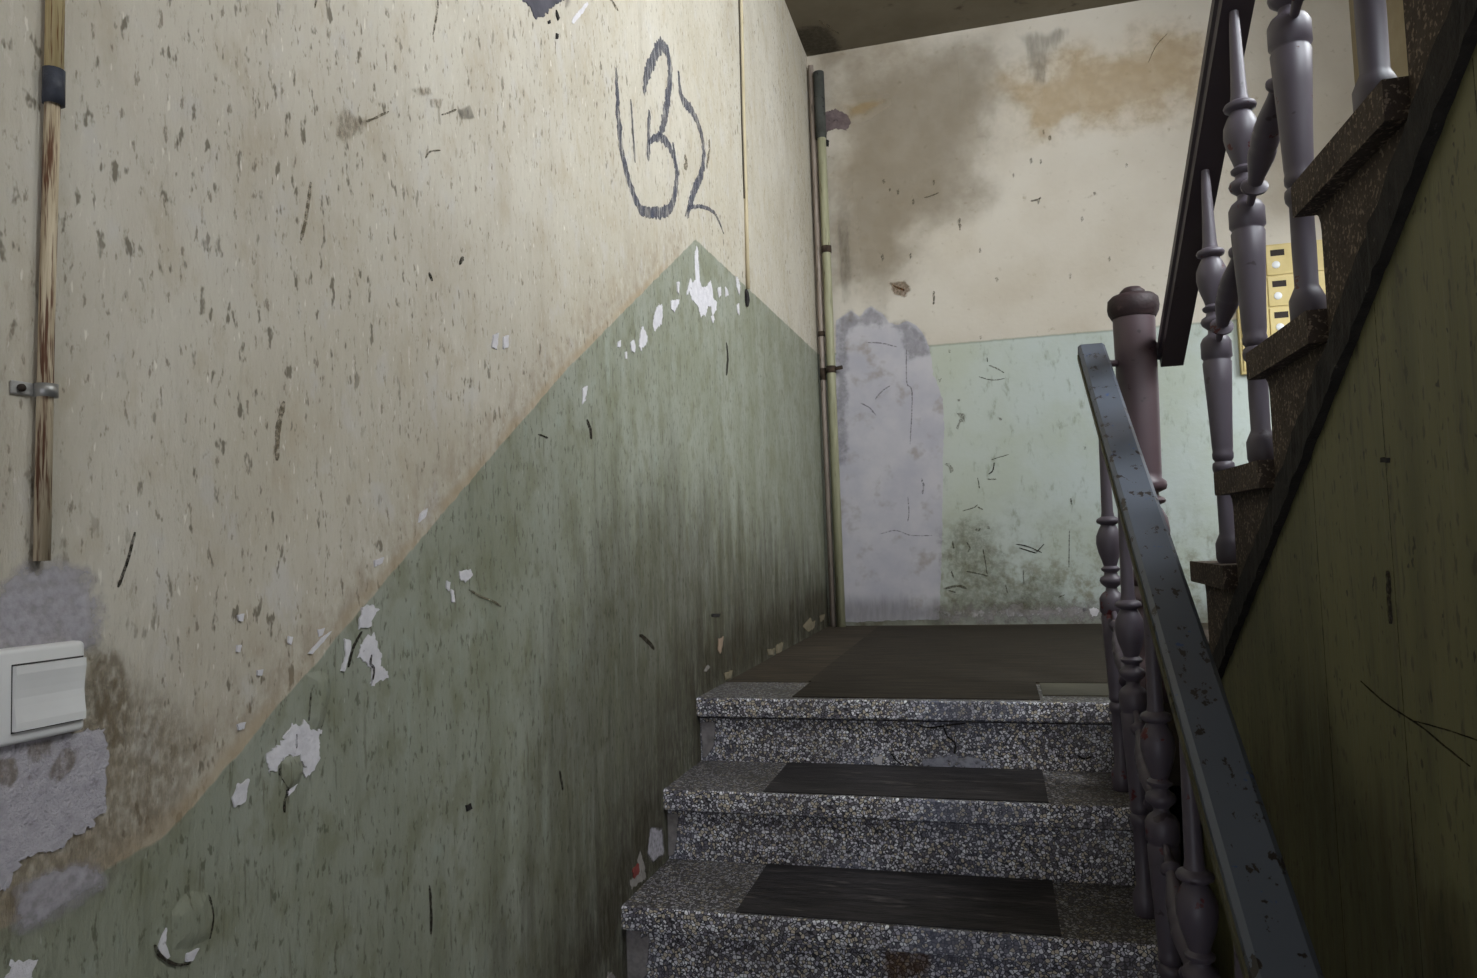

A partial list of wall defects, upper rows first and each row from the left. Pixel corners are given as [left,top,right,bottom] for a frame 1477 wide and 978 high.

peeling [617,246,740,359]
peeling [445,569,499,605]
peeling [287,604,389,686]
peeling [232,779,250,808]
peeling [266,719,322,813]
peeling [5,959,38,978]